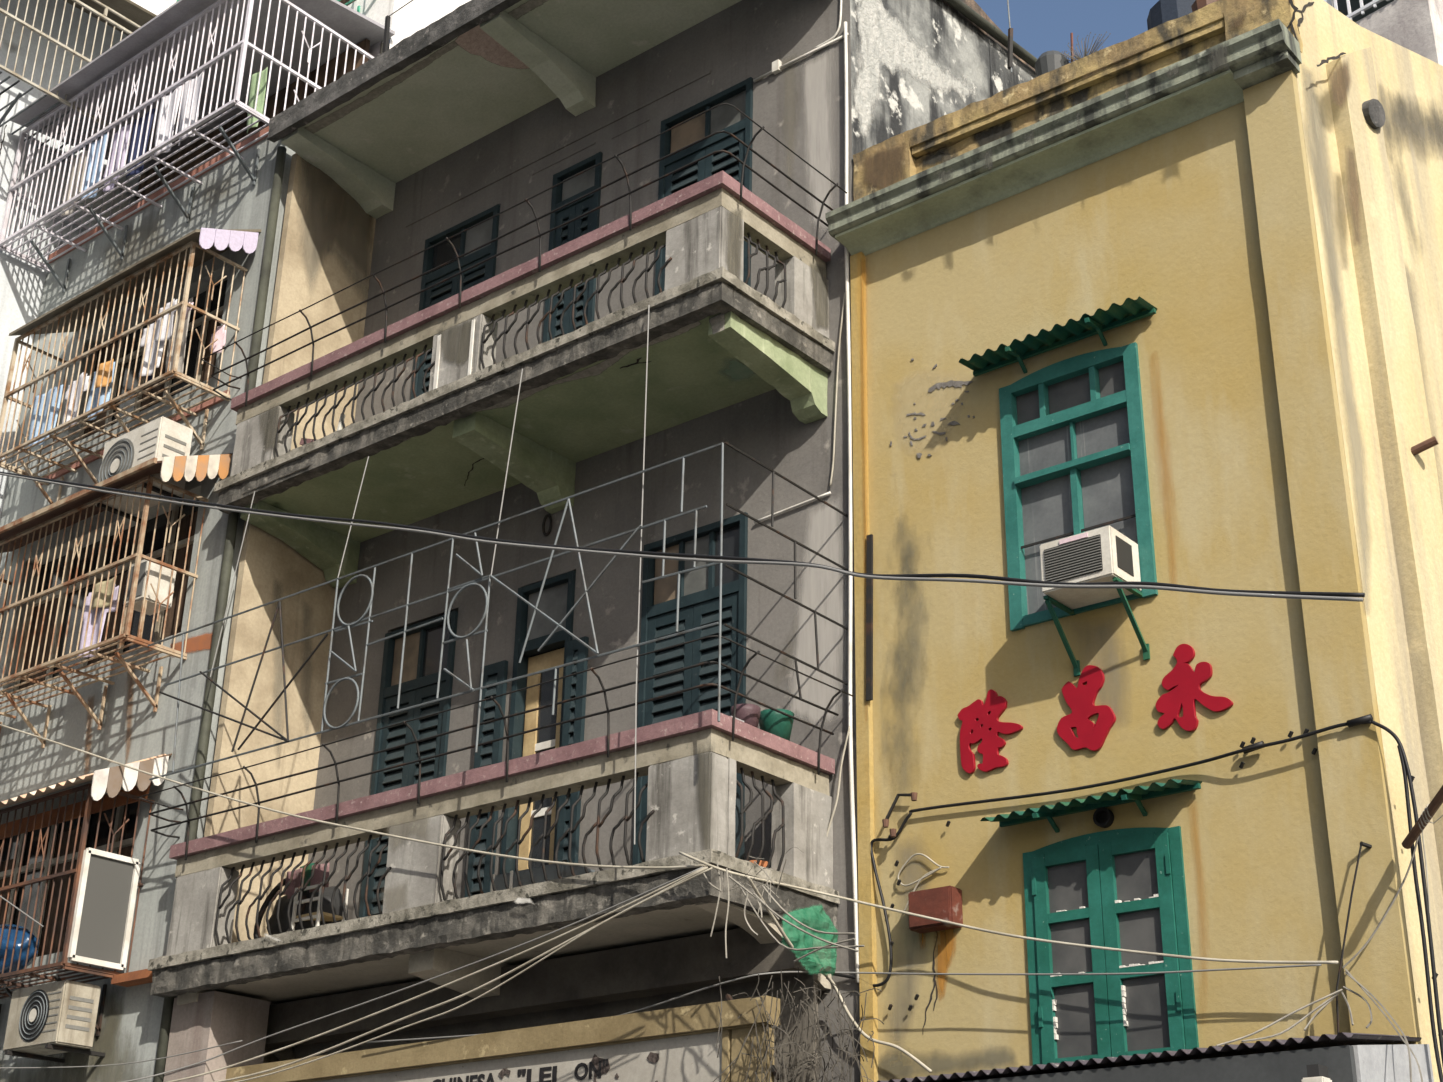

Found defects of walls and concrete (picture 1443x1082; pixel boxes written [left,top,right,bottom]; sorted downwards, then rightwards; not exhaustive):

water stain [937,0,984,39]
water stain [1384,101,1443,150]
peeling [890,364,975,458]
rust [921,929,955,994]